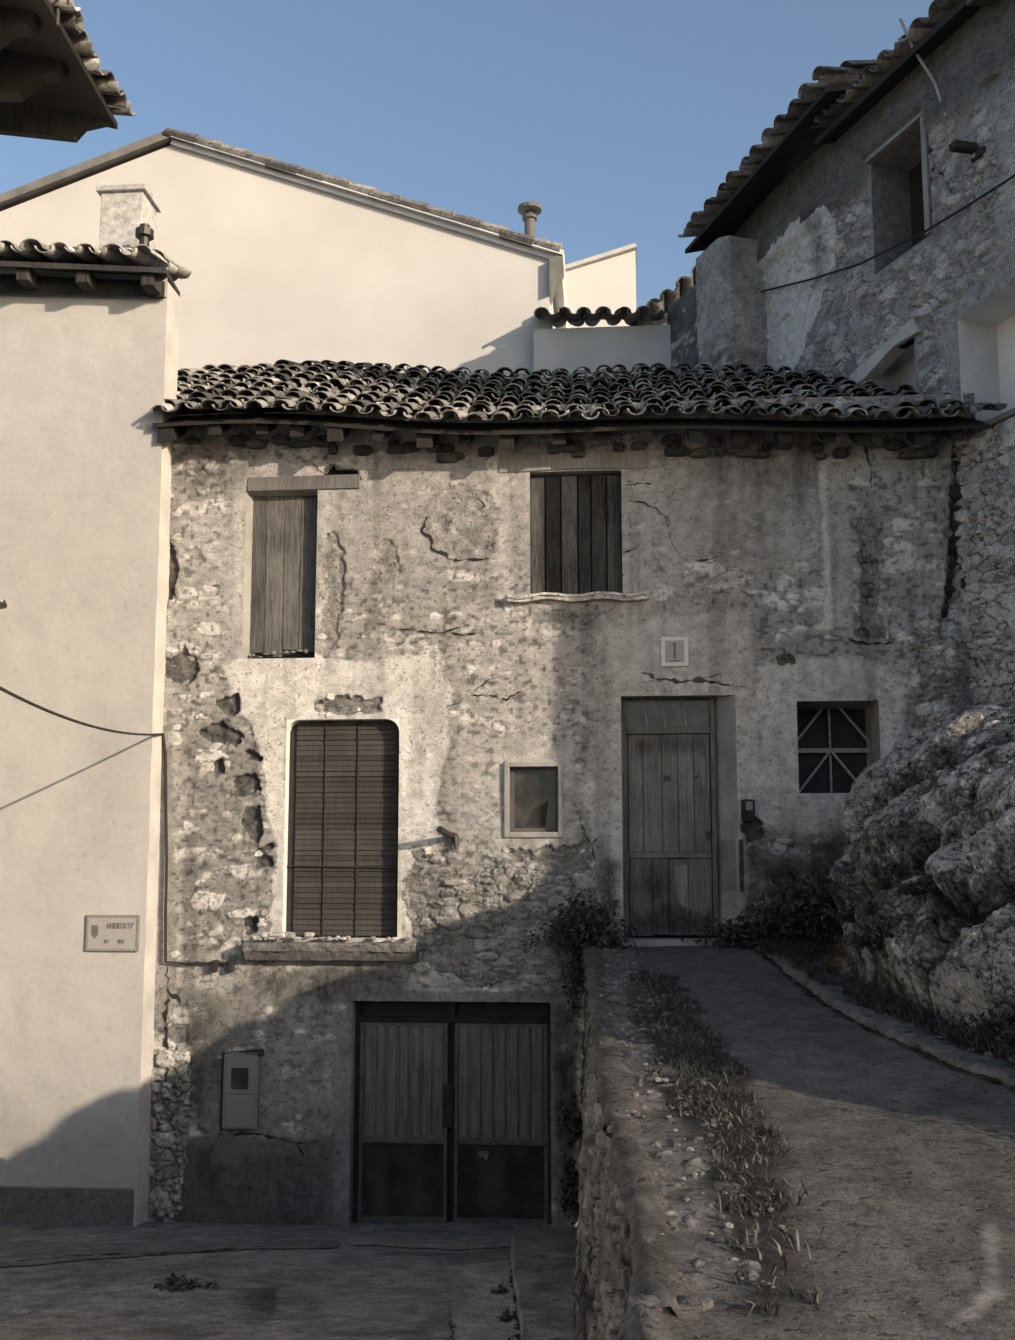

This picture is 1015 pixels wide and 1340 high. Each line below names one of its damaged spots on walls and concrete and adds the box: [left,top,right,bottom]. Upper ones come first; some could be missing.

crack [941,441,967,618]
spalling [165,647,202,685]
spalling [198,692,274,868]
spalling [244,892,271,935]